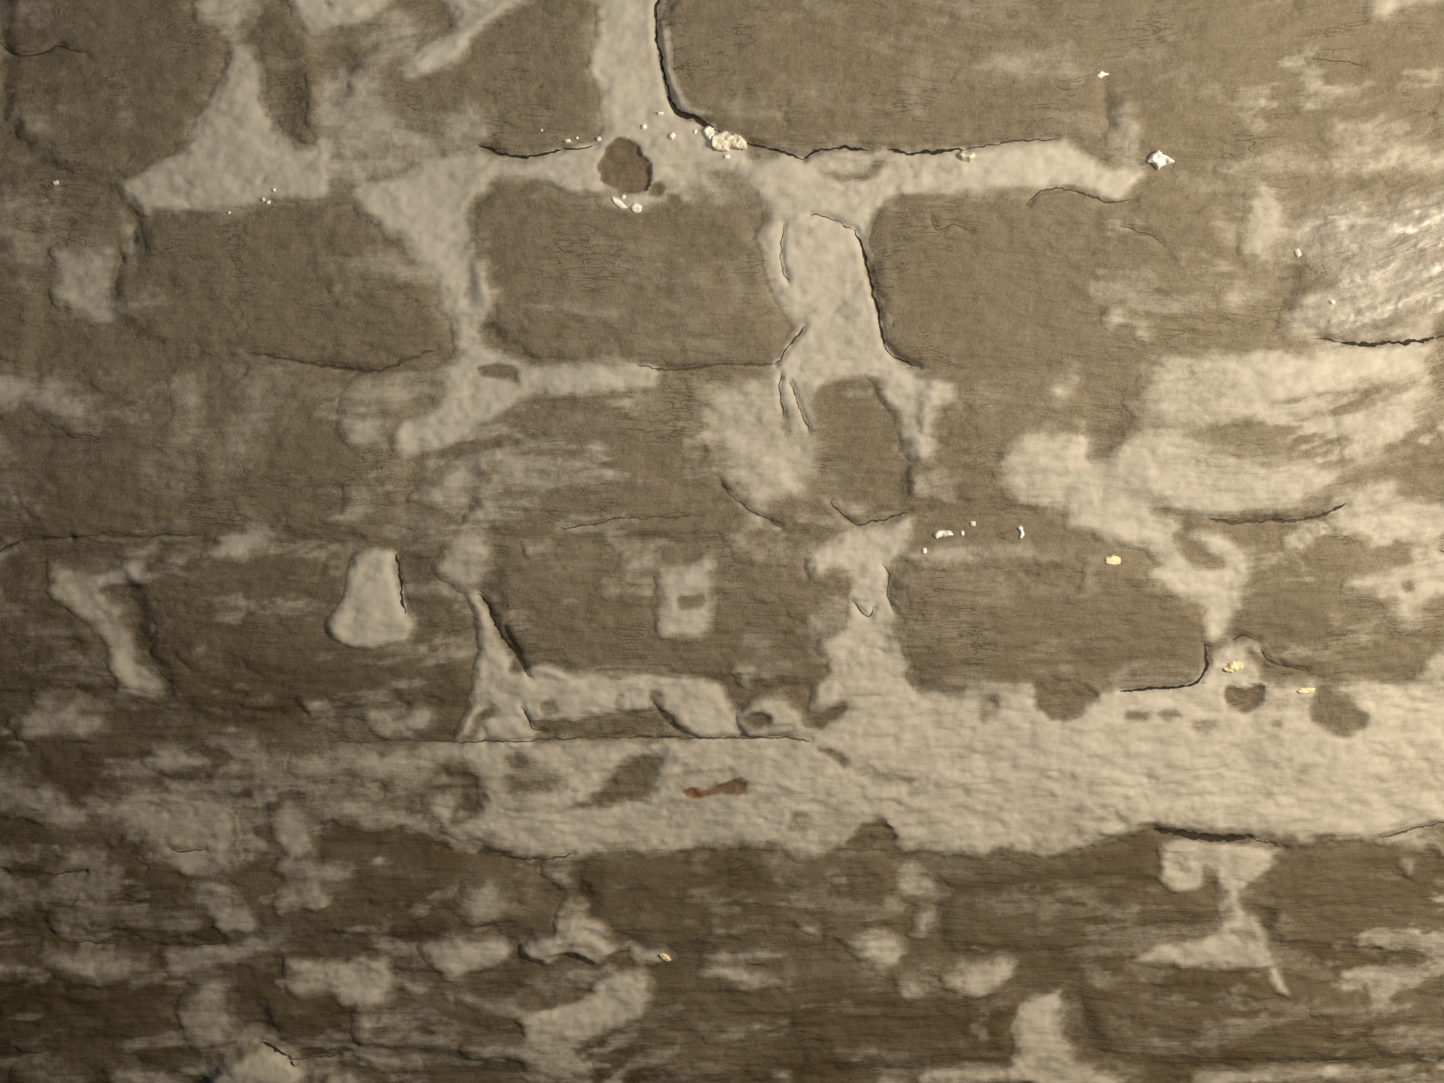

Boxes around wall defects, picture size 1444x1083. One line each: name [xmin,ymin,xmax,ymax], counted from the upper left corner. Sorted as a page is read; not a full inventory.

crack [654,0,1056,160]
crack [479,145,592,159]
spalling [594,112,681,213]
peeling [693,126,747,159]
crack [813,213,918,366]
crack [331,594,810,744]
spalling [1029,672,1100,722]
crack [1120,635,1303,692]
spalling [1223,661,1266,714]
spalling [1296,682,1369,738]
spalling [568,749,666,810]
corrosion [684,776,750,797]